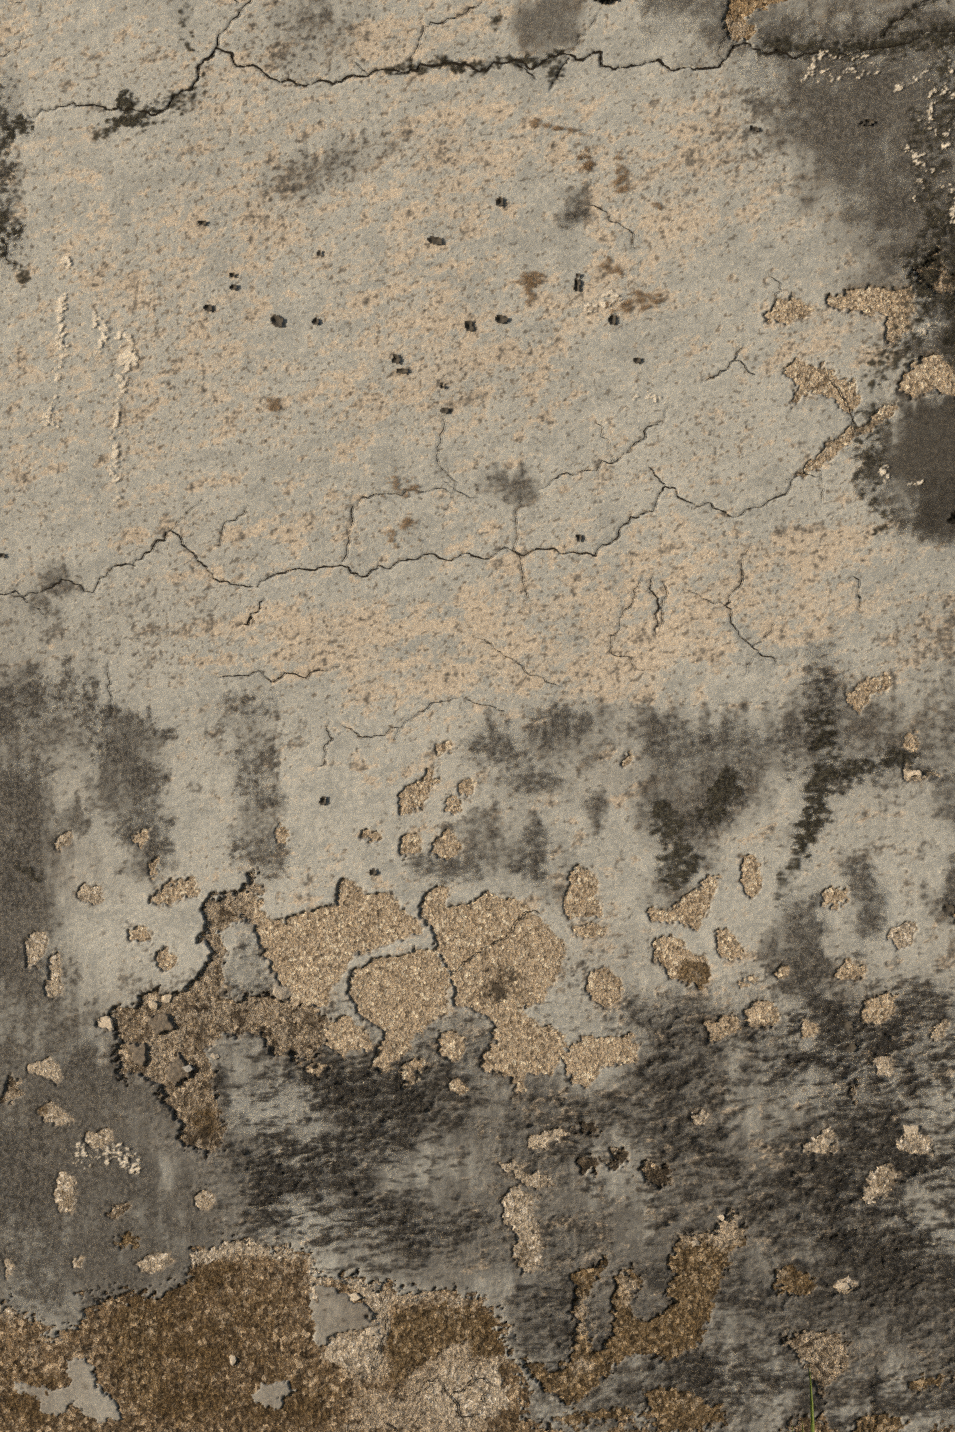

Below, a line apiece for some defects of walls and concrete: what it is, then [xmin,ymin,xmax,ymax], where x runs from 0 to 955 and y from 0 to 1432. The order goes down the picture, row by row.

leakage [384,0,583,86]
crack [29,0,955,118]
mould [0,85,34,288]
crack [705,347,754,381]
leakage [680,0,955,542]
peeling [783,354,955,478]
crack [0,369,897,673]
crack [219,666,335,682]
flaking render [97,827,639,1153]
leakage [757,666,955,1150]
flaking render [862,1124,935,1204]
flaking render [0,1202,748,1432]